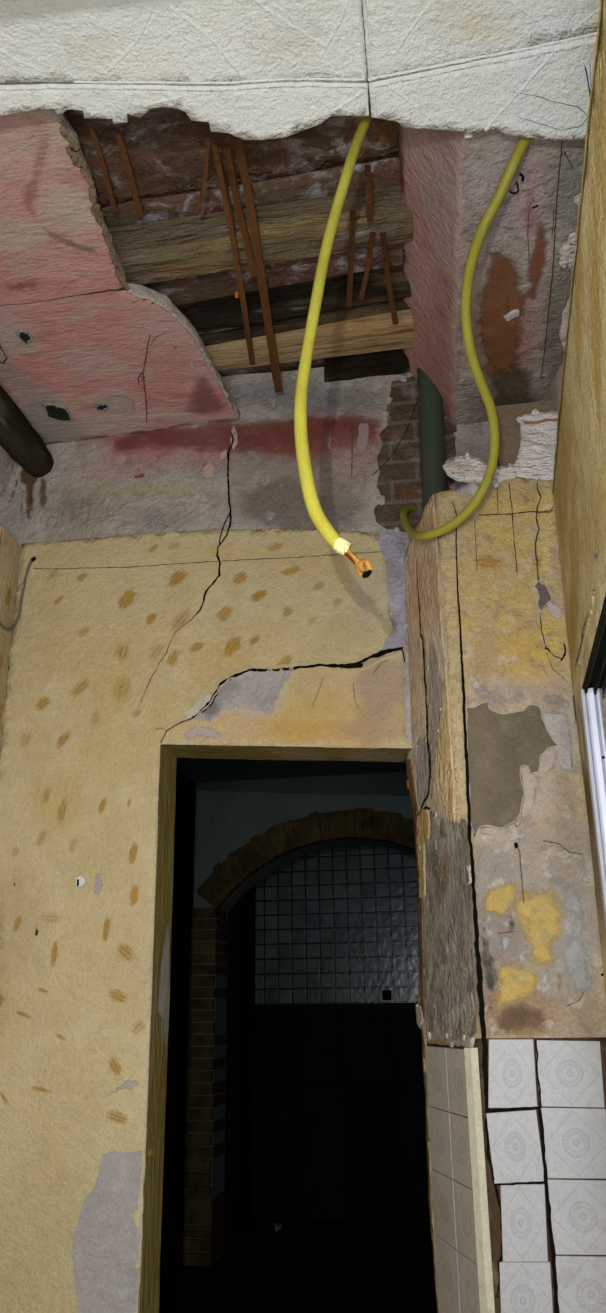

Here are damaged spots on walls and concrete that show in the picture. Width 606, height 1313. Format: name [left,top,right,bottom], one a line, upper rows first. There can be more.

spalling [58,120,232,409]
peeling [535,0,602,491]
flaking render [201,425,238,478]
crack [34,428,432,830]
crack [540,589,595,679]
spalling [405,680,576,1048]
crack [452,483,582,1313]
peeling [72,1150,143,1313]